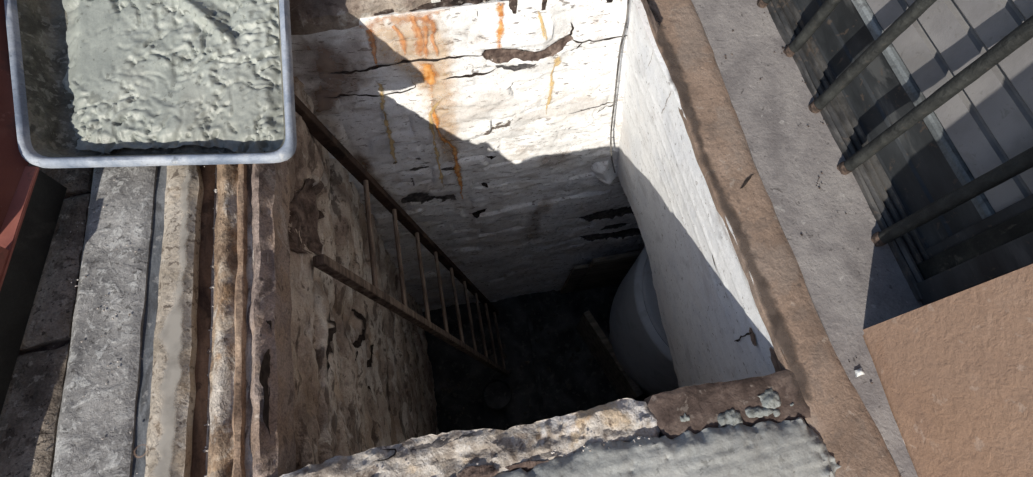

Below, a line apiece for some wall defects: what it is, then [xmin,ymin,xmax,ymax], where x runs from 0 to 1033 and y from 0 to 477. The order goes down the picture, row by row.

corrosion [359,12,438,86]
spalling [482,34,573,71]
corrosion [546,57,561,110]
corrosion [429,103,463,199]
peeling [401,158,460,204]
peeling [579,206,641,241]